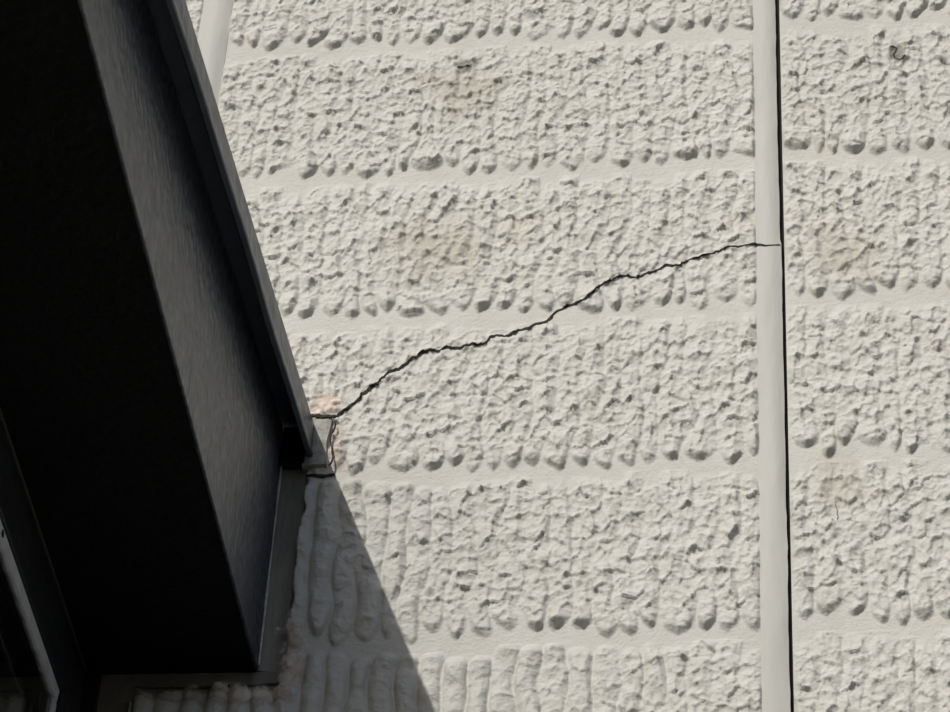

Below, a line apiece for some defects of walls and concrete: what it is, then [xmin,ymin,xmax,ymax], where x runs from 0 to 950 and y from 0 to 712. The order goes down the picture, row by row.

crack [306,242,780,478]